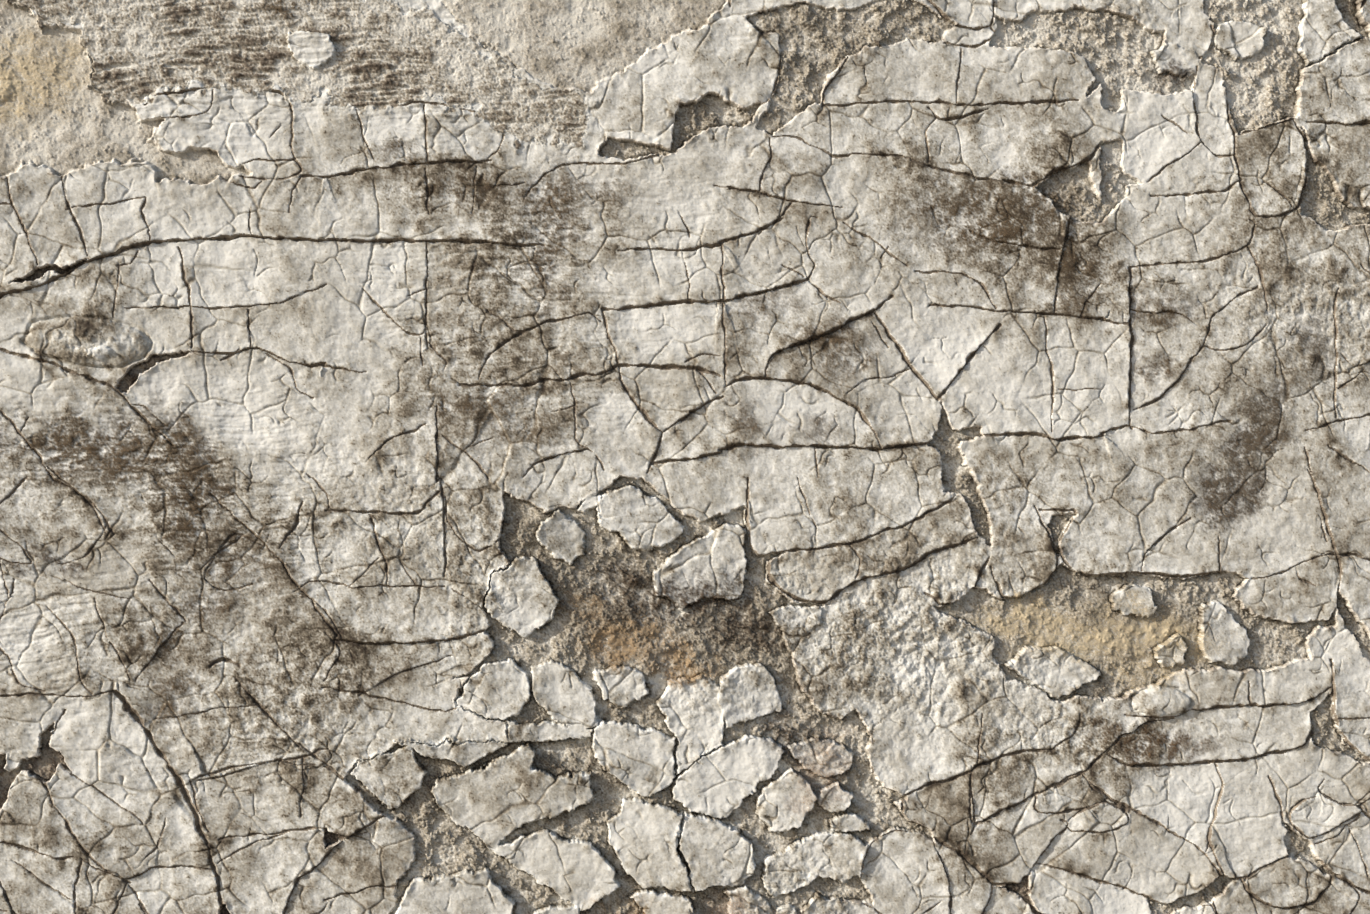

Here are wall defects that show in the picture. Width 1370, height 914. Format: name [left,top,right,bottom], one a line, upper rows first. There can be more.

peeling [0,0,957,186]
crack [0,0,1370,713]
crack [0,409,396,914]
spalling [323,827,344,849]
spalling [345,473,936,914]
crack [861,659,1370,914]
spalling [931,511,1370,704]